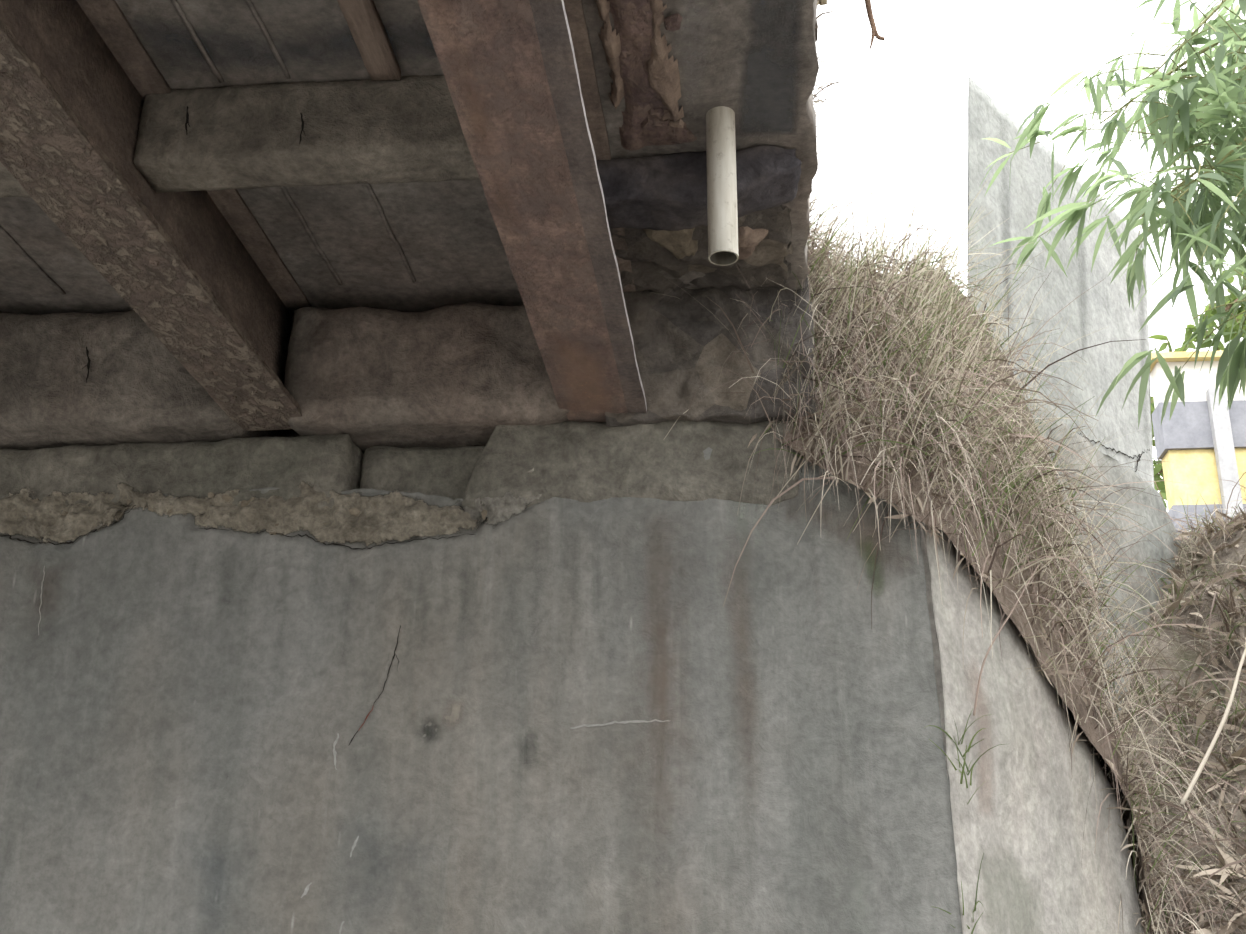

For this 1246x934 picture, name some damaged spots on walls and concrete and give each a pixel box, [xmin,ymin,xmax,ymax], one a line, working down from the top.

spalling [595,0,697,151]
crack [183,106,191,135]
crack [298,113,306,144]
crack [82,347,91,383]
crack [1077,432,1150,472]
spalling [0,481,482,550]
crack [348,625,401,746]